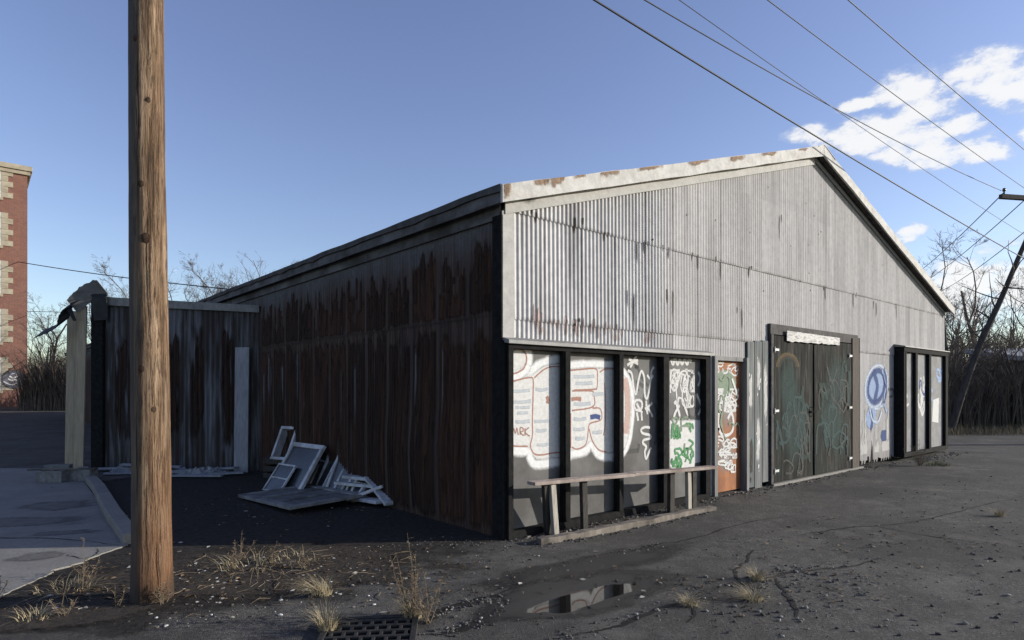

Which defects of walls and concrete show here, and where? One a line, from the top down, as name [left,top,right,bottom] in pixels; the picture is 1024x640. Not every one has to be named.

rust [535,174,586,187]
rust [262,242,492,516]